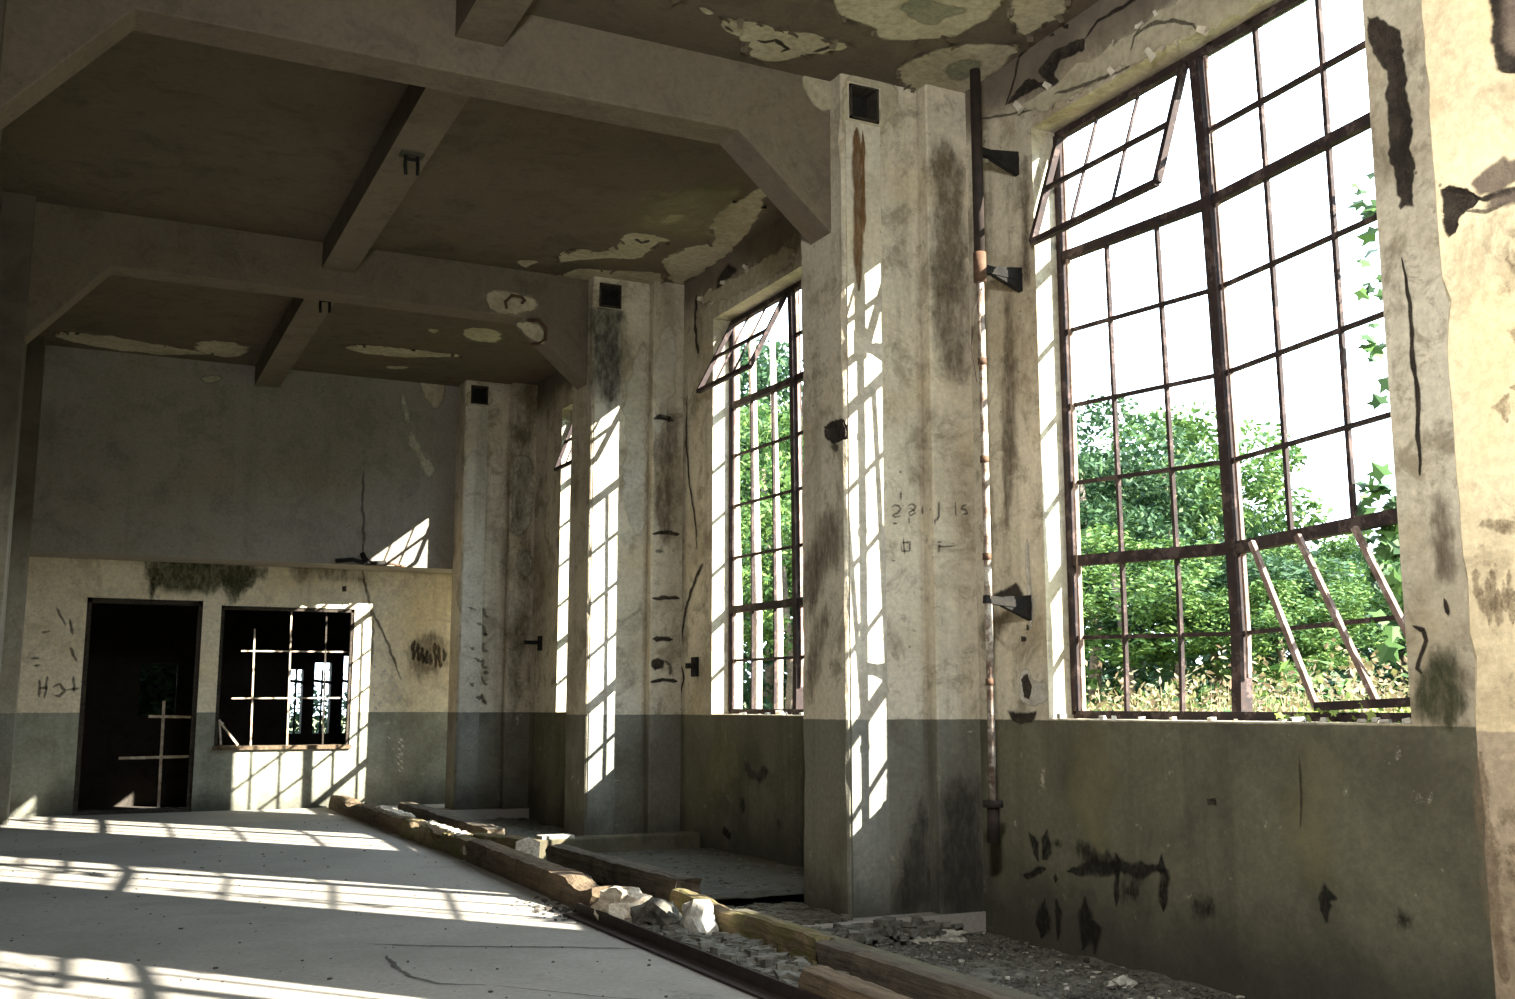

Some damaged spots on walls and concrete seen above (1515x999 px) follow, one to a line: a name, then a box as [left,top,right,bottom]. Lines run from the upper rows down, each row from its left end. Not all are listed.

peeling [700,0,1262,134]
crack [1367,17,1415,208]
spalling [1489,0,1515,72]
peeling [50,331,247,357]
peeling [420,383,445,409]
peeling [346,291,547,369]
peeling [621,326,677,534]
peeling [517,189,796,354]
crack [1401,257,1422,476]
leakage [145,561,267,603]
crack [342,470,401,679]
crack [1412,598,1450,674]